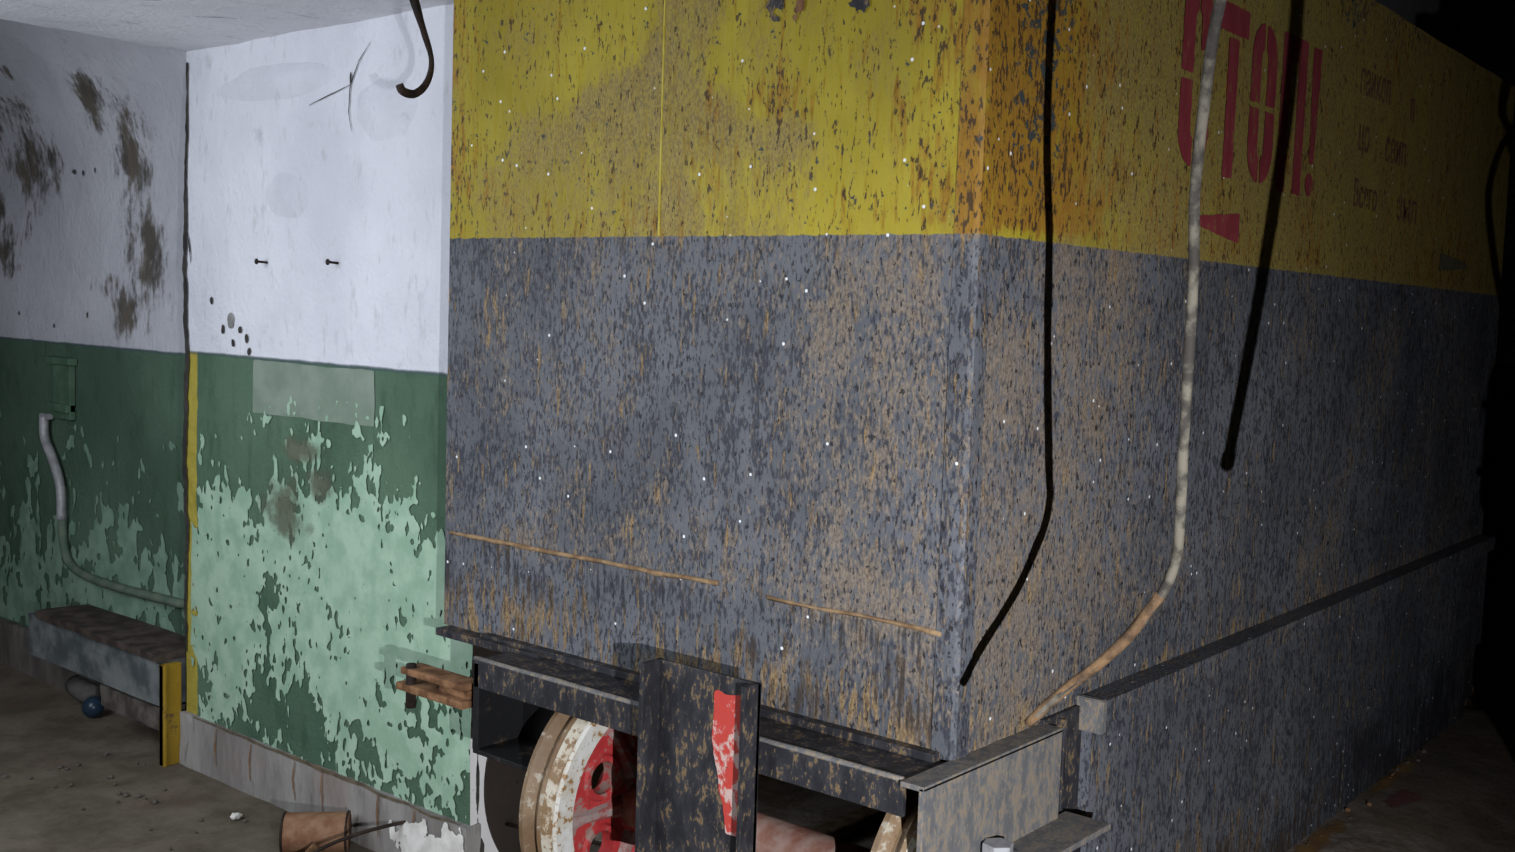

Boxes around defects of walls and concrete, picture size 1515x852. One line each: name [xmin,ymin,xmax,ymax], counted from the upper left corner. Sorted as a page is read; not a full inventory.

water stain [0,195,26,277]
water stain [0,99,59,207]
water stain [72,70,167,334]
peeling [0,396,473,852]